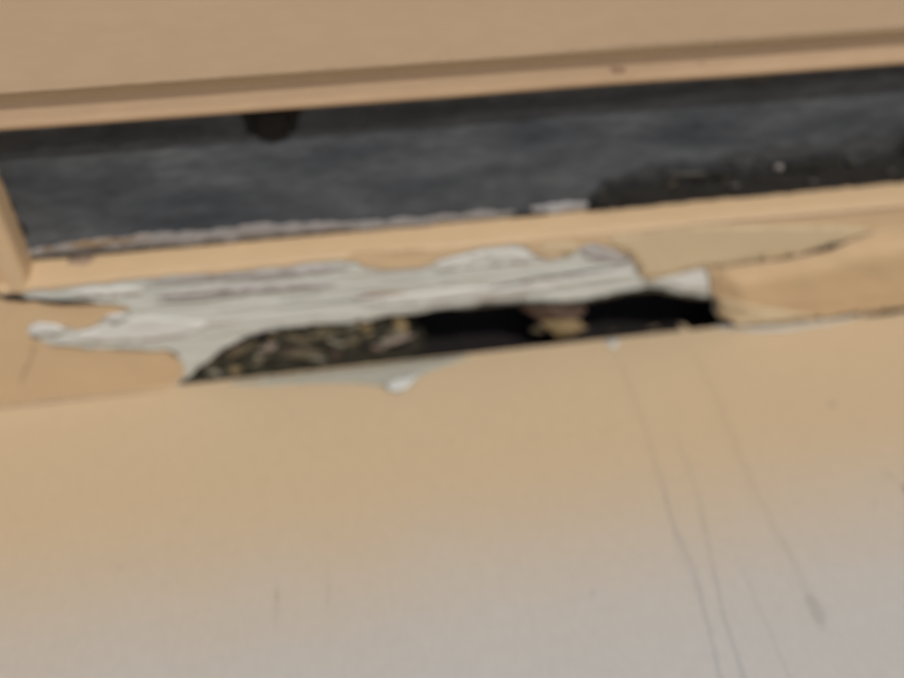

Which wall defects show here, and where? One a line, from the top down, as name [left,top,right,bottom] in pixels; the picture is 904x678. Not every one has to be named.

peeling [386,374,420,391]
peeling [8,225,867,385]